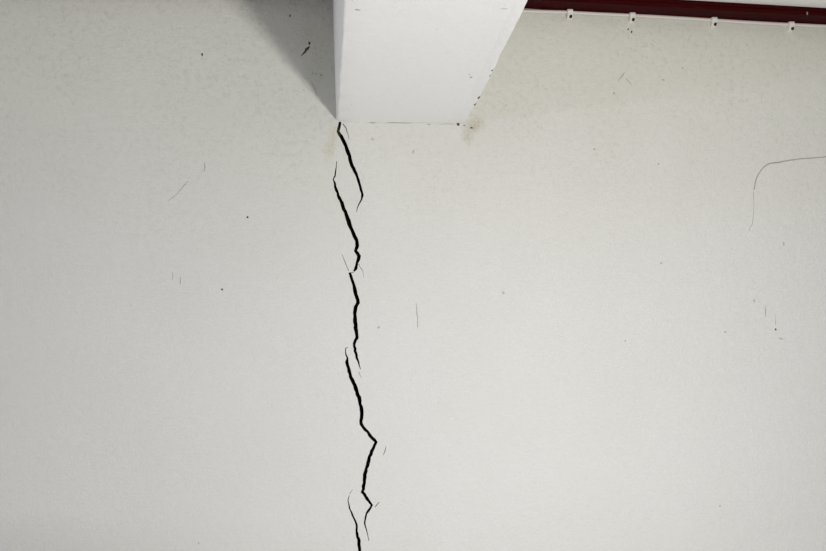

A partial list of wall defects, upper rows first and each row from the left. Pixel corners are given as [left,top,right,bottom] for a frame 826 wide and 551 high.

crack [333,122,386,551]